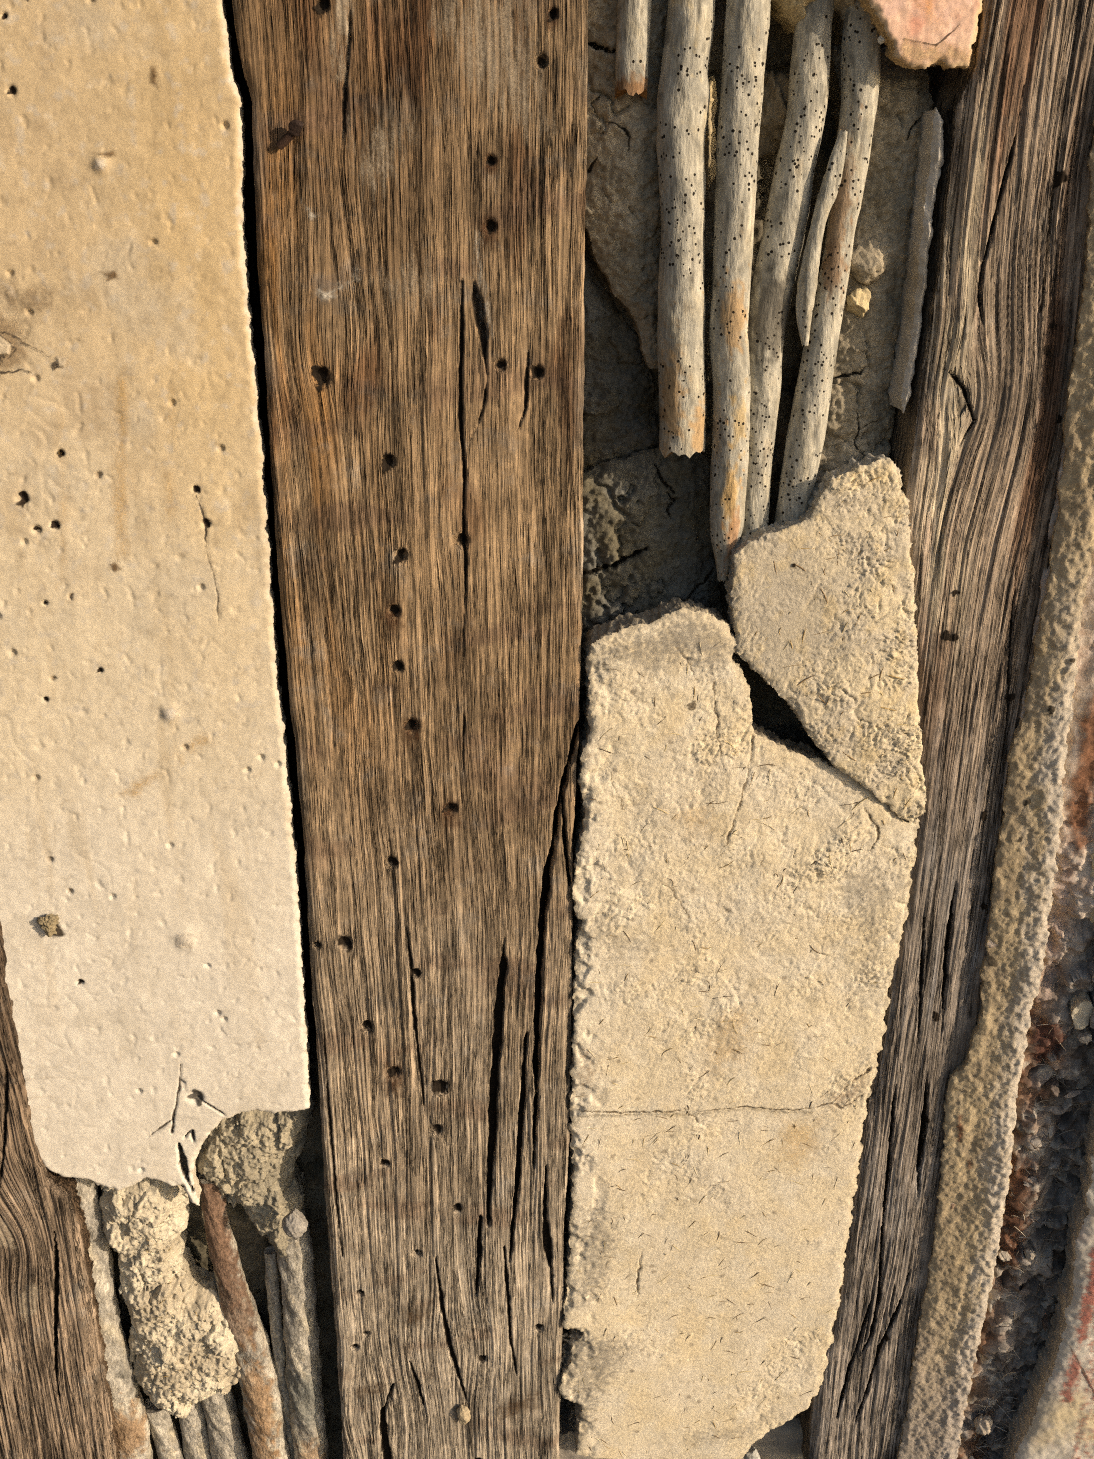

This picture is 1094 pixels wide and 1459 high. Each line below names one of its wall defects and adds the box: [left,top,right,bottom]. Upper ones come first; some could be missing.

peeling [902,41,969,64]
crack [865,810,880,850]
crack [406,927,424,1105]
crack [436,721,578,1399]
crack [581,1067,926,1421]
crack [380,1362,424,1459]